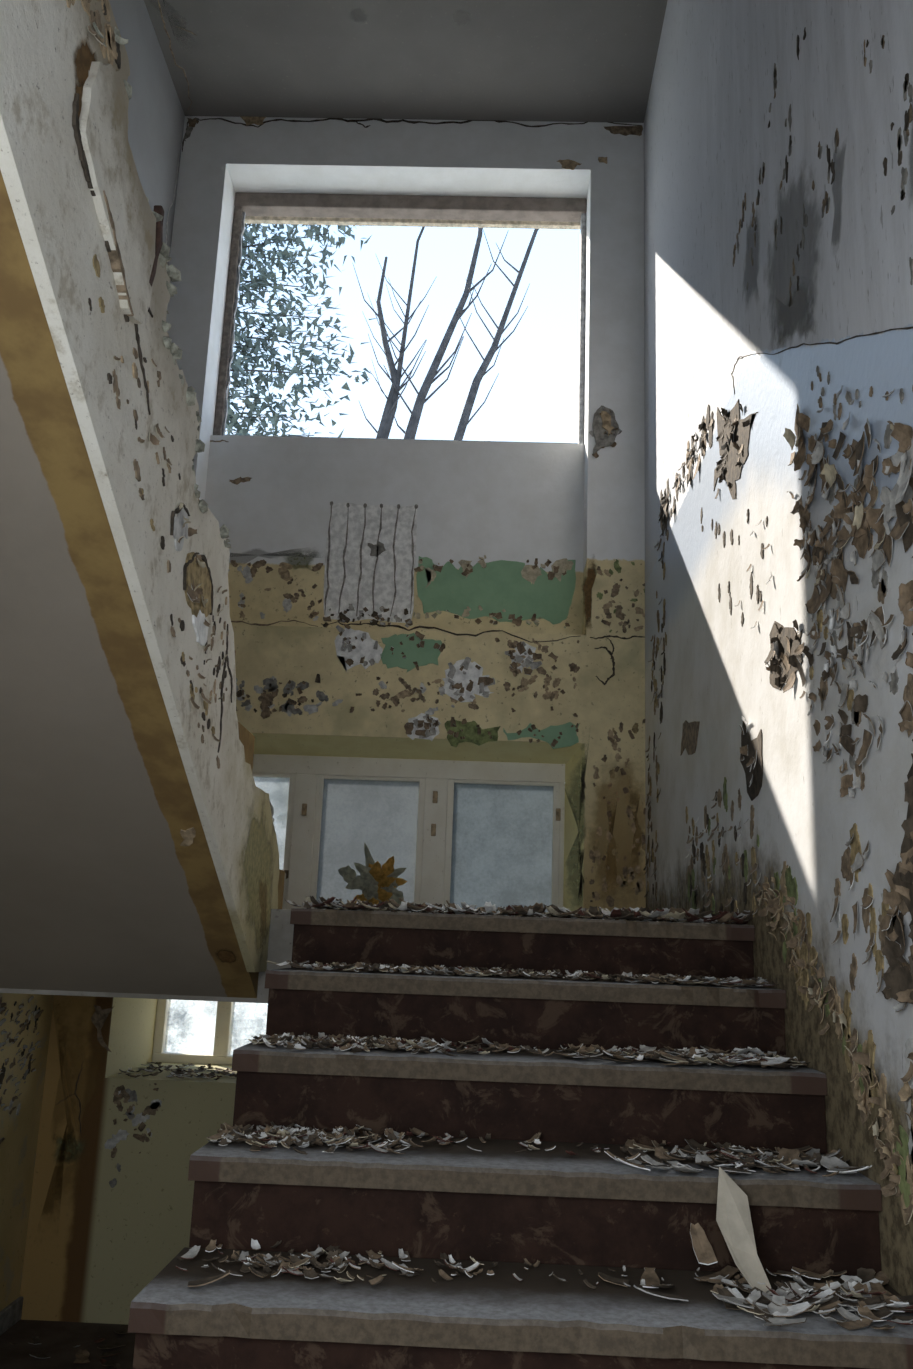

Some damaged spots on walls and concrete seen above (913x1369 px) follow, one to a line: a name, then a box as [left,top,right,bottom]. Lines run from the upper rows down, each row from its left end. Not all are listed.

peeling [864,35,885,74]
peeling [92,254,100,278]
peeling [88,297,105,313]
peeling [733,63,792,267]
peeling [789,128,839,307]
peeling [883,73,913,215]
peeling [107,242,580,769]
peeling [0,996,44,1115]
peeling [690,1223,910,1319]